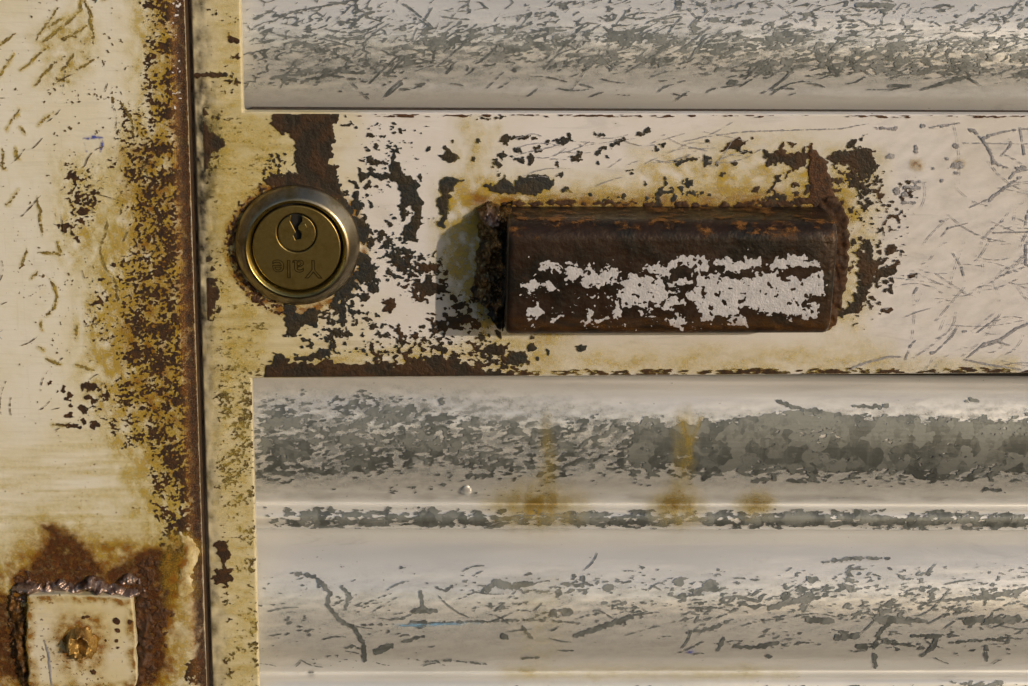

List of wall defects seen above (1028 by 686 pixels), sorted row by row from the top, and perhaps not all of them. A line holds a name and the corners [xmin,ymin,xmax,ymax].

peeling [207,0,1028,95]
spalling [47,0,203,597]
rust [0,0,335,686]
peeling [259,114,465,362]
rust [337,115,430,219]
peeling [426,138,481,163]
peeling [443,114,674,196]
rust [211,135,918,381]
peeling [644,176,711,206]
peeling [674,137,754,177]
peeling [506,249,1028,376]
peeling [211,343,1028,686]